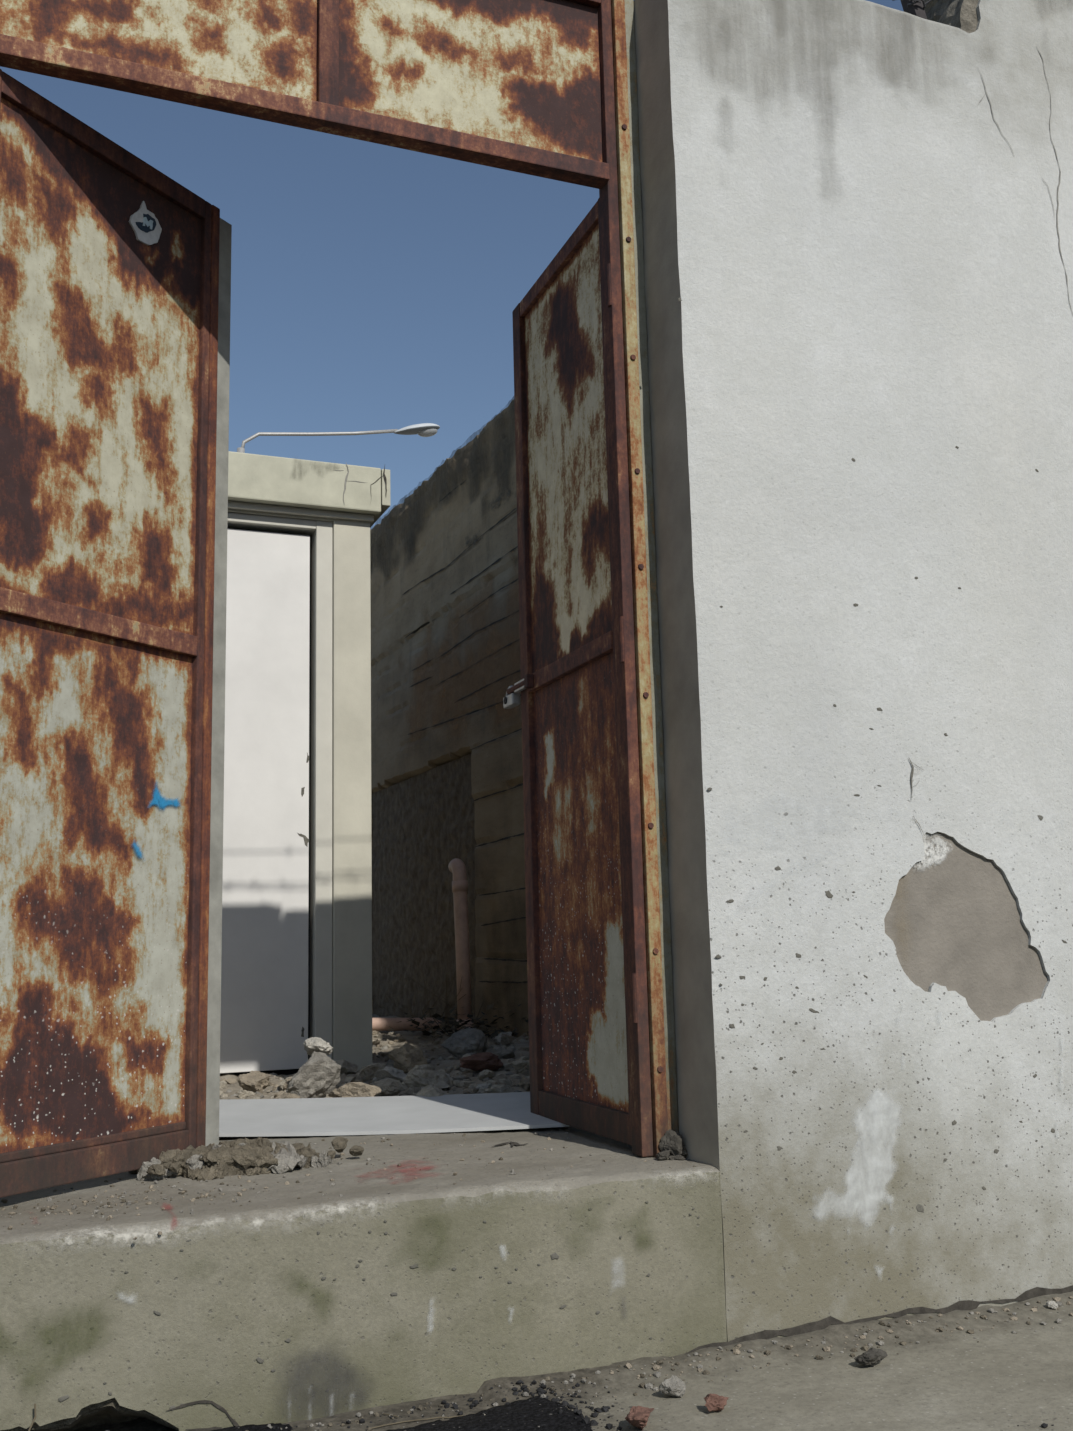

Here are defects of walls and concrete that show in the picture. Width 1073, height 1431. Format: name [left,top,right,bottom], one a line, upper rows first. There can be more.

spalling [922,0,979,33]
crack [979,70,1014,154]
crack [1037,47,1073,313]
flaking render [884,832,1048,1021]
water stain [844,1091,898,1217]
spalling [0,1382,239,1431]